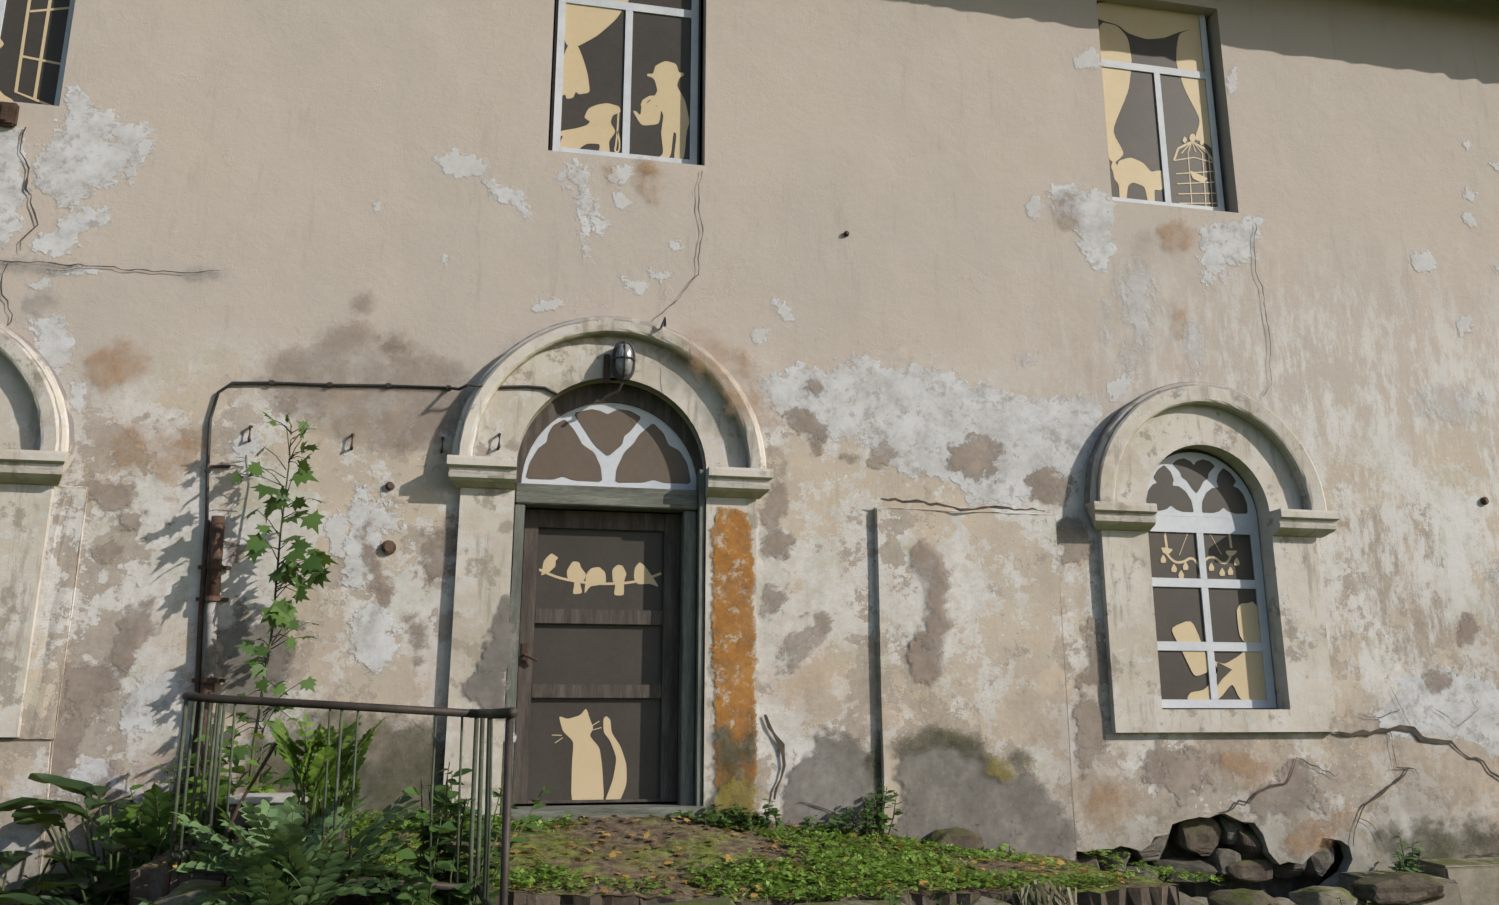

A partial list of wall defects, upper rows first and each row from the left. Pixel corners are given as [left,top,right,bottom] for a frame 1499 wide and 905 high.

peeling [0,84,156,291]
crack [0,127,220,326]
peeling [555,157,634,259]
crack [652,177,703,321]
peeling [1196,211,1266,292]
peeling [751,182,1157,565]
peeling [323,483,459,675]
rust [710,506,759,809]
crack [881,498,1045,512]
water stain [866,723,988,823]
crack [1218,757,1339,814]
crack [1335,690,1499,850]